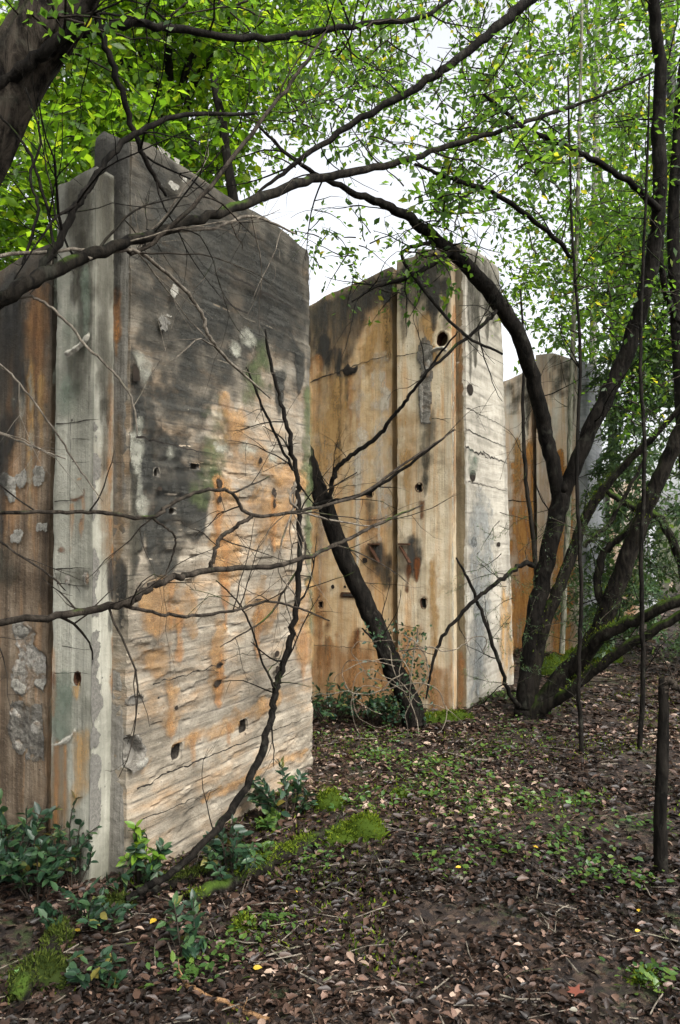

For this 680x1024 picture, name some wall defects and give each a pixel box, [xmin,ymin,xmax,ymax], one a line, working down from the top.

rust [28,365,42,472]
damp [65,140,451,628]
rust [316,377,350,476]
spalling [6,621,46,762]
rust [139,584,182,659]
crack [137,714,315,790]
rust [220,696,280,734]
rust [211,454,307,706]
rust [294,608,391,704]